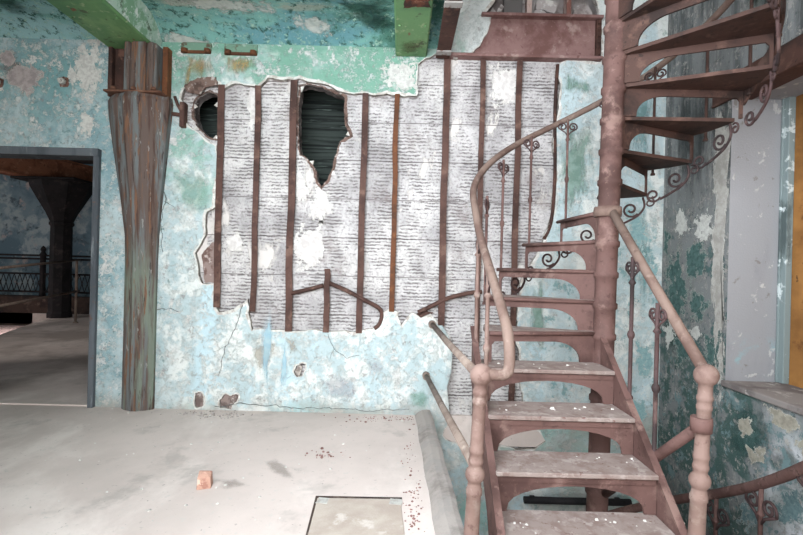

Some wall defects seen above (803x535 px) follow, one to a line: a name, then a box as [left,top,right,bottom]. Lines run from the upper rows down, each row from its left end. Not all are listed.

peeling [0,50,49,97]
spalling [179,0,604,415]
peeling [736,417,766,465]
peeling [763,403,803,456]
peeling [772,482,803,533]